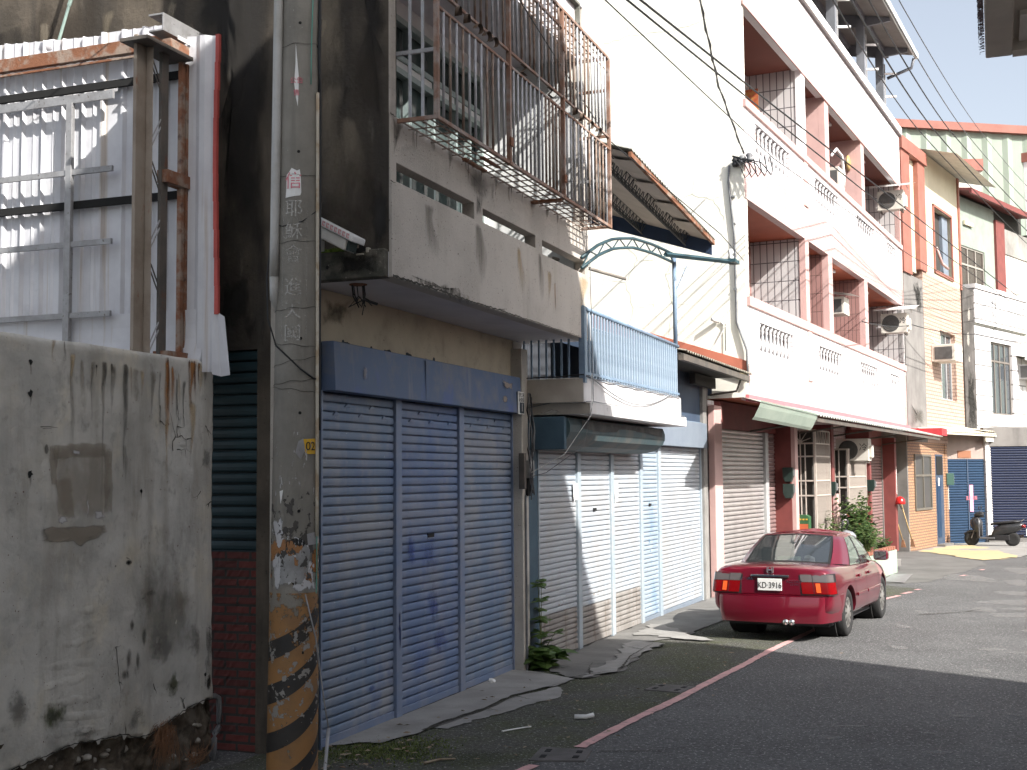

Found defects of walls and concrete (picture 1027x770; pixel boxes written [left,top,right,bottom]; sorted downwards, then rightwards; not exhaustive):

corrosion [165,359,174,415]
crack [160,380,211,453]
corrosion [189,361,206,394]
peeling [270,432,320,592]
flaking render [11,697,210,770]